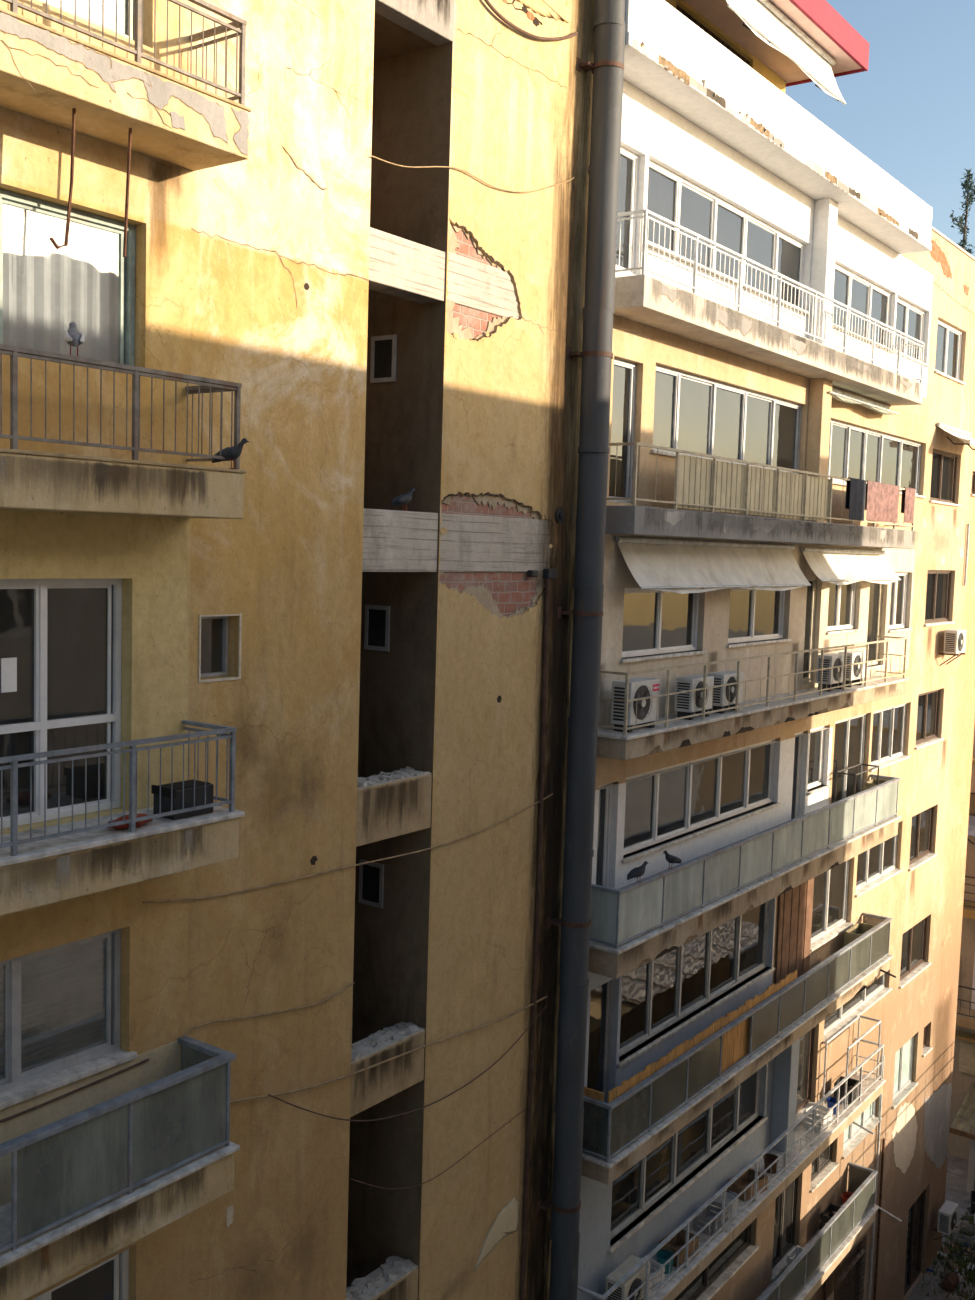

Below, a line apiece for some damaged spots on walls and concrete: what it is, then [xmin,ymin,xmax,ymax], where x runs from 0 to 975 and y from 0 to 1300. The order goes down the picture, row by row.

peeling [0,12,249,156]
crack [287,0,363,139]
spalling [633,38,785,149]
crack [191,228,368,302]
spalling [445,222,522,342]
spalling [805,157,969,295]
spalling [439,492,554,618]